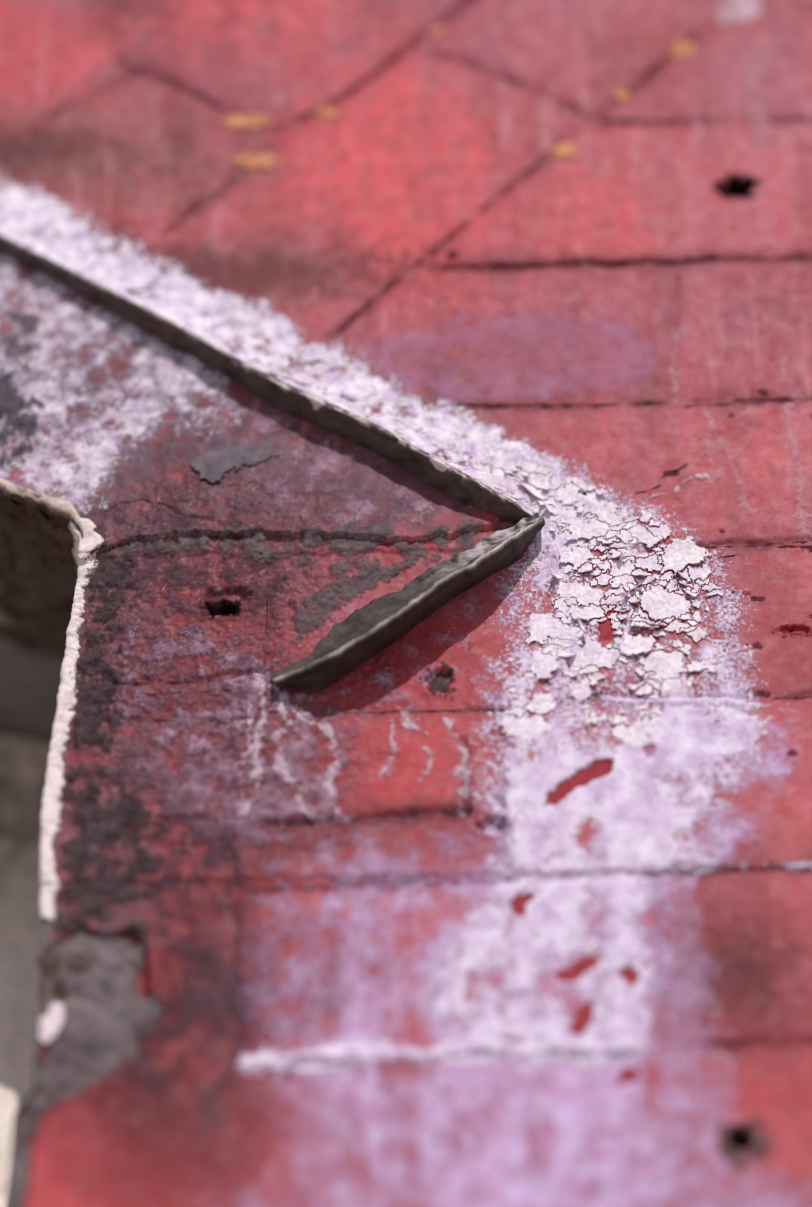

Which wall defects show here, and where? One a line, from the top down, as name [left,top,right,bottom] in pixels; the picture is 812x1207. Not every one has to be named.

damp [0,254,440,539]
peeling [190,441,279,483]
peeling [265,348,765,758]
damp [618,584,647,618]
damp [116,617,361,844]
damp [378,708,432,781]
peeling [543,759,614,807]
spalling [0,477,161,1207]
peeling [509,894,534,918]
peeling [557,953,601,981]
peeling [617,965,640,987]
peeling [568,1001,593,1036]